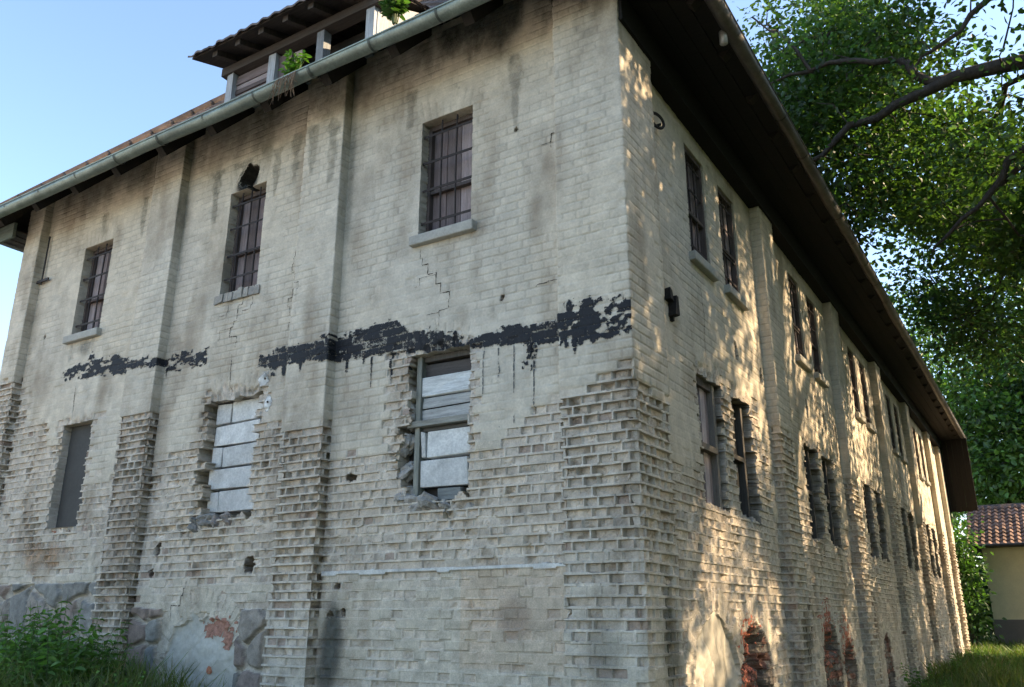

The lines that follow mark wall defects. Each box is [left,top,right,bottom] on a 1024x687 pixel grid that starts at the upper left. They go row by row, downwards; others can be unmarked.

crack [414,255,450,315]
spalling [0,329,971,687]